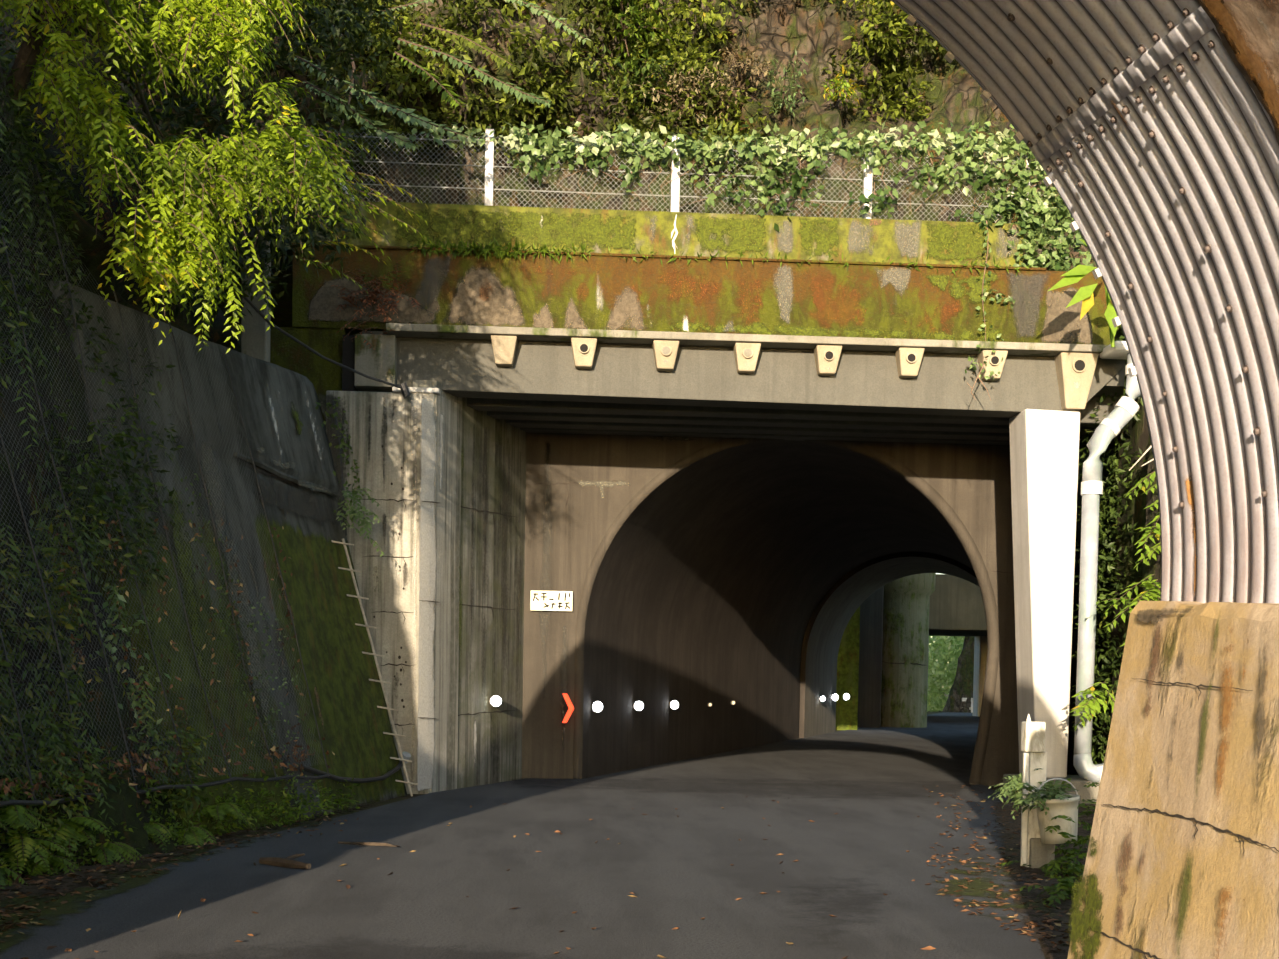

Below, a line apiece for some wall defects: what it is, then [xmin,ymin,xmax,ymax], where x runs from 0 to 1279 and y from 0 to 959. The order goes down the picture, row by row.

corrosion [1202,0,1279,128]
damp [774,266,793,322]
damp [368,399,396,478]
damp [401,398,443,791]
damp [459,431,521,686]
crack [1132,678,1253,701]
crack [1103,804,1279,855]